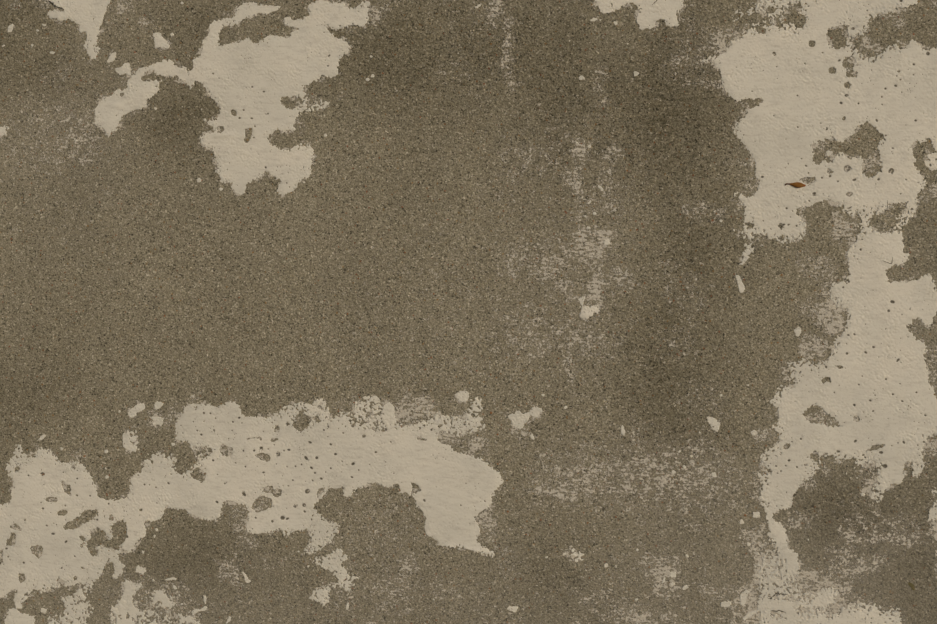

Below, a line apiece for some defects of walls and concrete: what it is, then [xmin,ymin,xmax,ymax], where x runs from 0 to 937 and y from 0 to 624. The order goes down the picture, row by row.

peeling [0,97,29,188]
peeling [32,0,398,198]
peeling [0,259,668,624]
peeling [578,0,937,624]